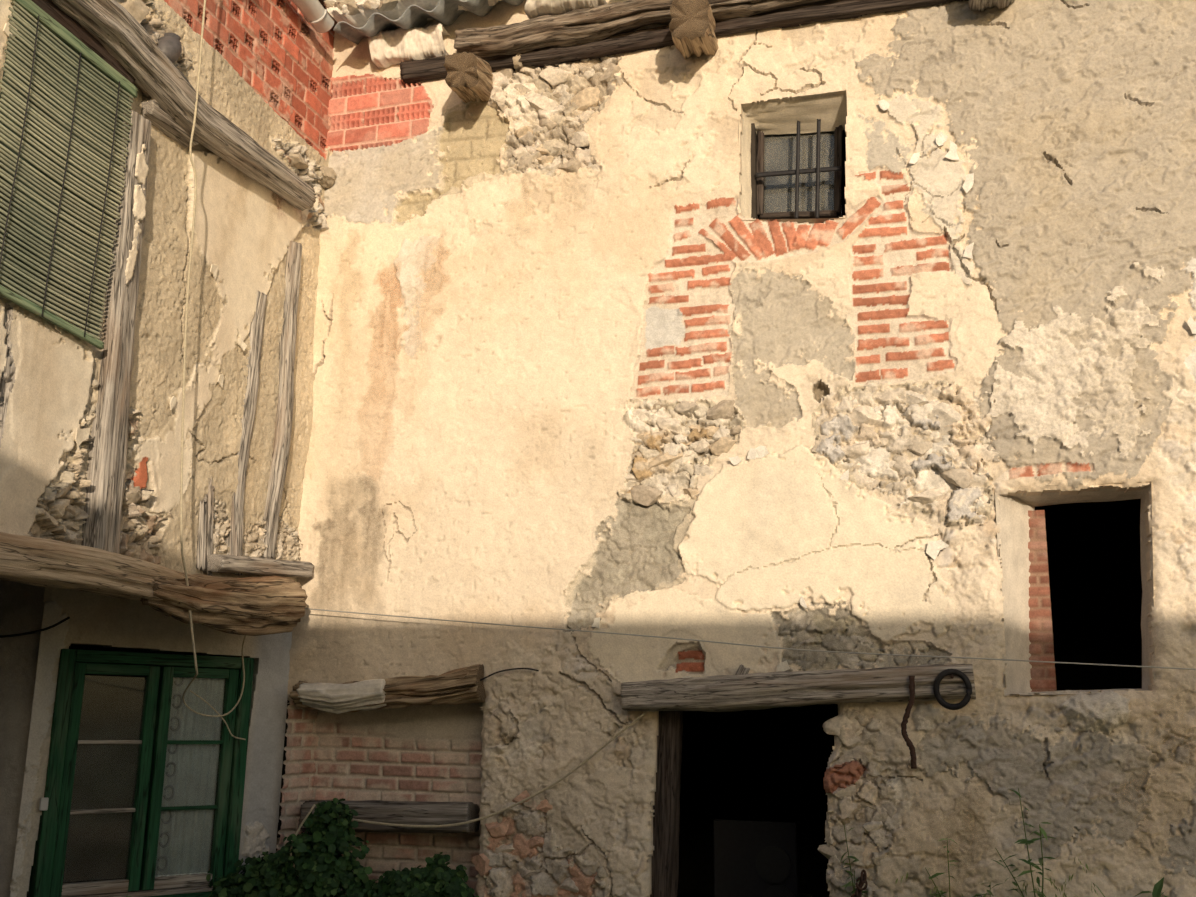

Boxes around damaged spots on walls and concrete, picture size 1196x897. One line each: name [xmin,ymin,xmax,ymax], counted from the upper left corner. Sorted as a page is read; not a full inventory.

crack [728,29,826,111]
spalling [326,56,627,358]
peeling [0,296,100,545]
peeling [120,135,329,564]
crack [379,500,418,578]
crack [720,472,943,601]
peeling [562,92,1167,683]